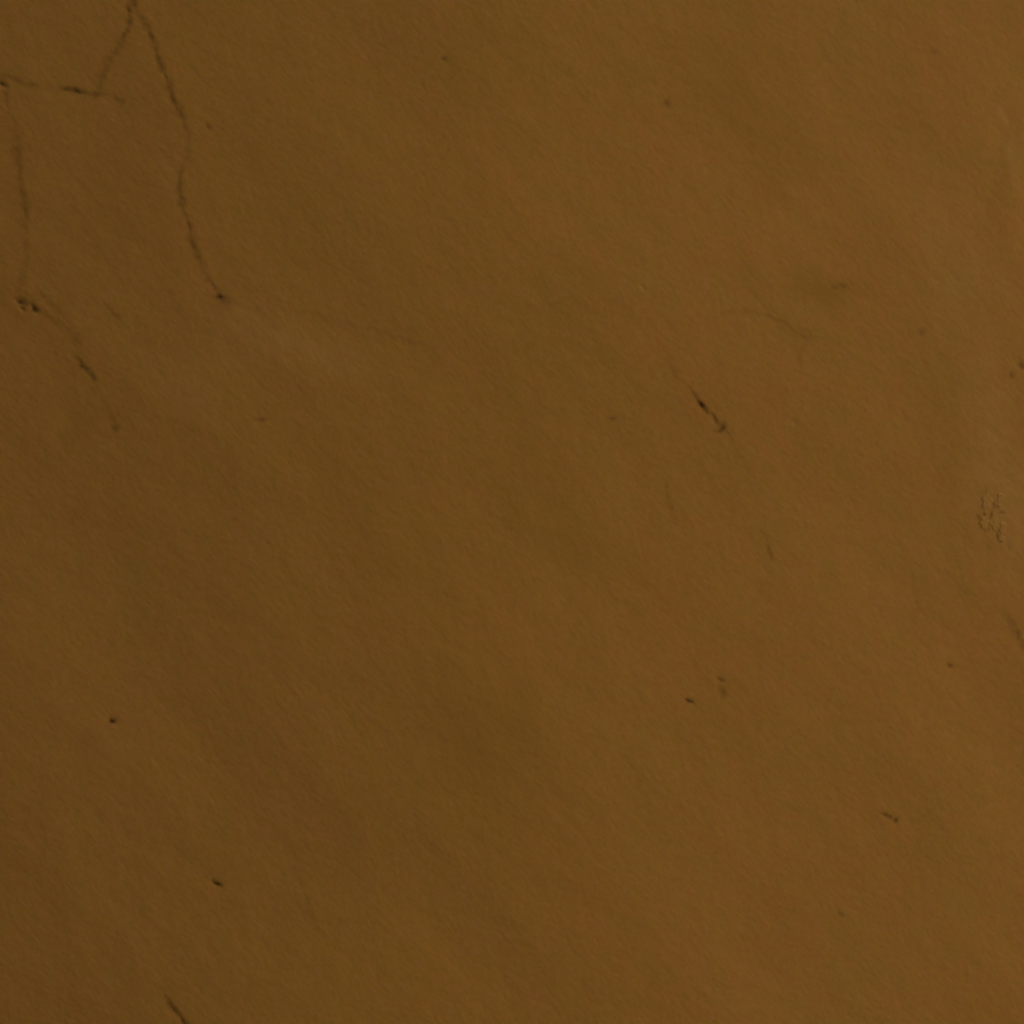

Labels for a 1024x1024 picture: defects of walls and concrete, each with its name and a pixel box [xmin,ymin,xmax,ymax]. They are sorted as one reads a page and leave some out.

crack [0,0,240,312]
crack [662,355,754,474]